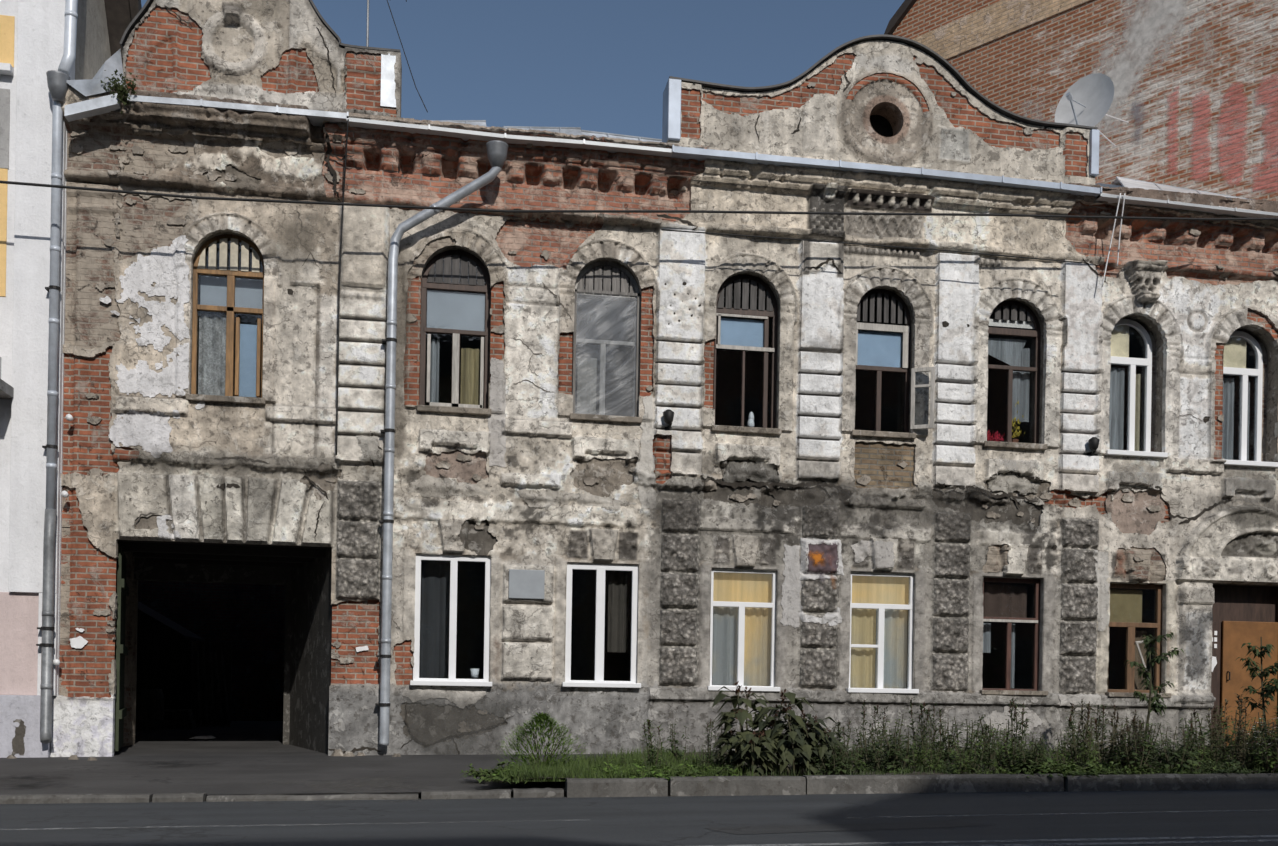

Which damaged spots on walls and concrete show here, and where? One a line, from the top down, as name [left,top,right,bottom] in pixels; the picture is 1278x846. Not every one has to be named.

flaking render [125,6,211,93]
flaking render [258,49,1090,270]
flaking render [59,115,196,698]
spalling [570,456,638,497]
flaking render [652,435,672,484]
flaking render [854,442,917,489]
spalling [458,520,498,555]
spalling [932,475,1170,583]
crack [1112,486,1232,524]
flaking render [331,599,381,685]
flaking render [393,640,413,686]
peeling [12,719,26,755]